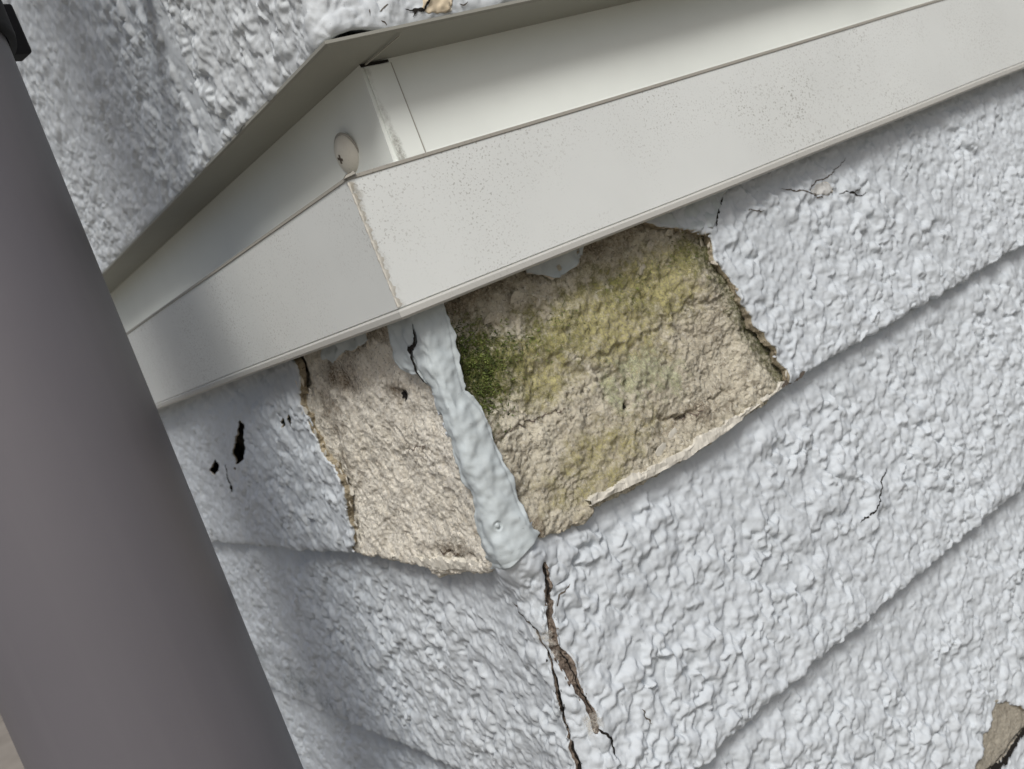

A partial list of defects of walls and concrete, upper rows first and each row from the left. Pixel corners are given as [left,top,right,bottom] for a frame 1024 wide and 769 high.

crack [782,158,866,198]
spalling [295,326,494,578]
spalling [444,189,805,538]
crack [860,467,887,523]
crack [514,562,615,769]
spalling [975,699,1024,769]